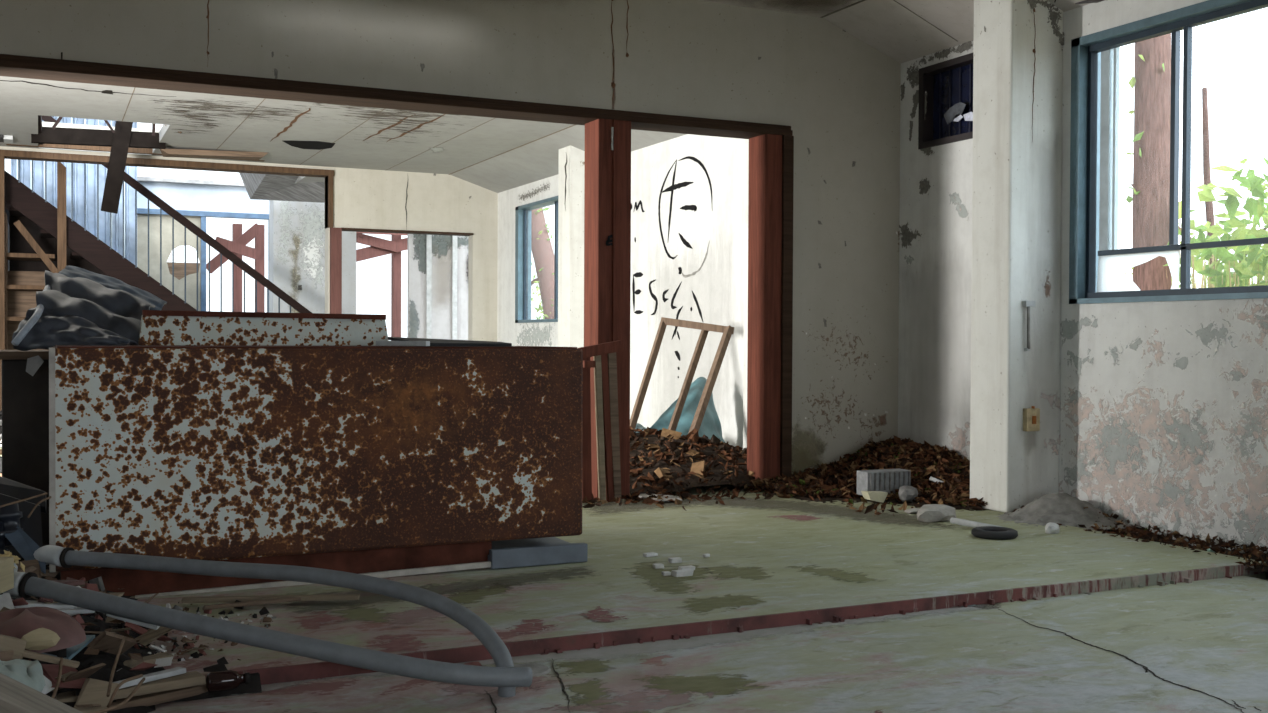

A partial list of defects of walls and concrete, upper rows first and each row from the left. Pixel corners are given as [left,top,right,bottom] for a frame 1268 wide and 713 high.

water stain [153,100,236,129]
crack [203,0,211,67]
crack [611,0,629,102]
peeling [900,40,973,156]
crack [1032,0,1056,141]
peeling [896,214,922,265]
peeling [917,178,931,195]
peeling [949,192,968,221]
peeling [798,317,888,445]
peeling [1041,298,1268,553]
crack [552,659,570,712]
crack [998,609,1261,713]